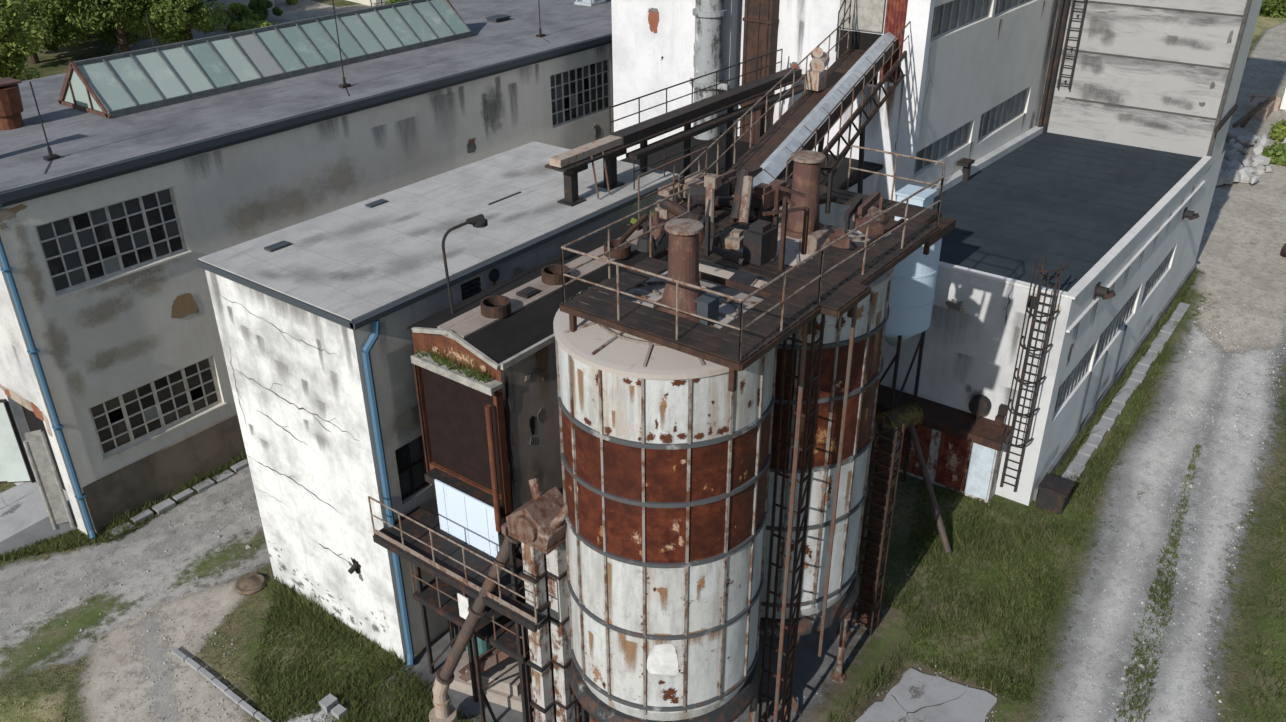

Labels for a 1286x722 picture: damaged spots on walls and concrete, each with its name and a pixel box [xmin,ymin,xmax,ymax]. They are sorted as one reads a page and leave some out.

crack [228,344,359,445]
corrosion [571,360,615,435]
corrosion [638,378,729,444]
crack [256,461,333,508]
corrosion [821,471,851,505]
corrosion [790,540,812,569]
crack [890,693,964,721]